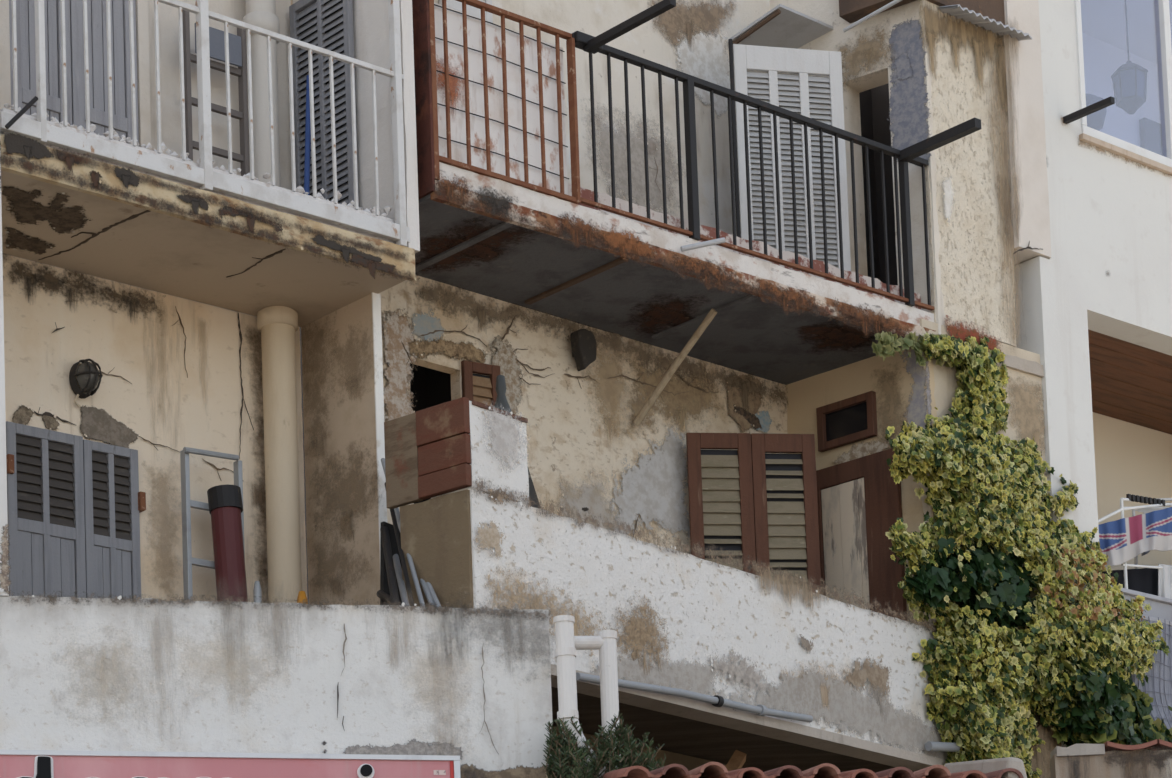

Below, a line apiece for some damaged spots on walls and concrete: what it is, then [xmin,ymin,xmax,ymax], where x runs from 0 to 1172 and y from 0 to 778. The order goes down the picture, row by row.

leakage [920,4,1020,341]
spalling [2,186,91,255]
leakage [3,255,162,317]
crack [226,249,286,278]
corrosion [1,133,920,352]
spalling [12,405,60,430]
crack [34,408,75,425]
crack [137,306,254,480]
crack [401,315,718,402]
peeling [473,423,937,632]
peeling [617,634,957,760]